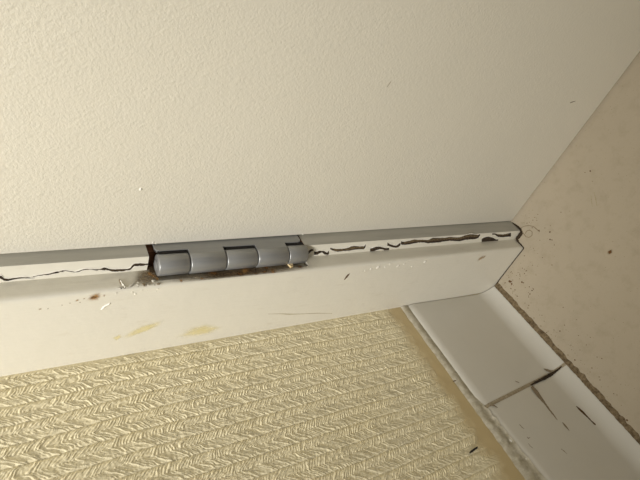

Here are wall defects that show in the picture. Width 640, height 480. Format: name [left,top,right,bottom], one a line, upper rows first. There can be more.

crack [308,232,511,256]
crack [0,262,148,282]
corrosion [138,267,158,283]
corrosion [190,265,287,279]